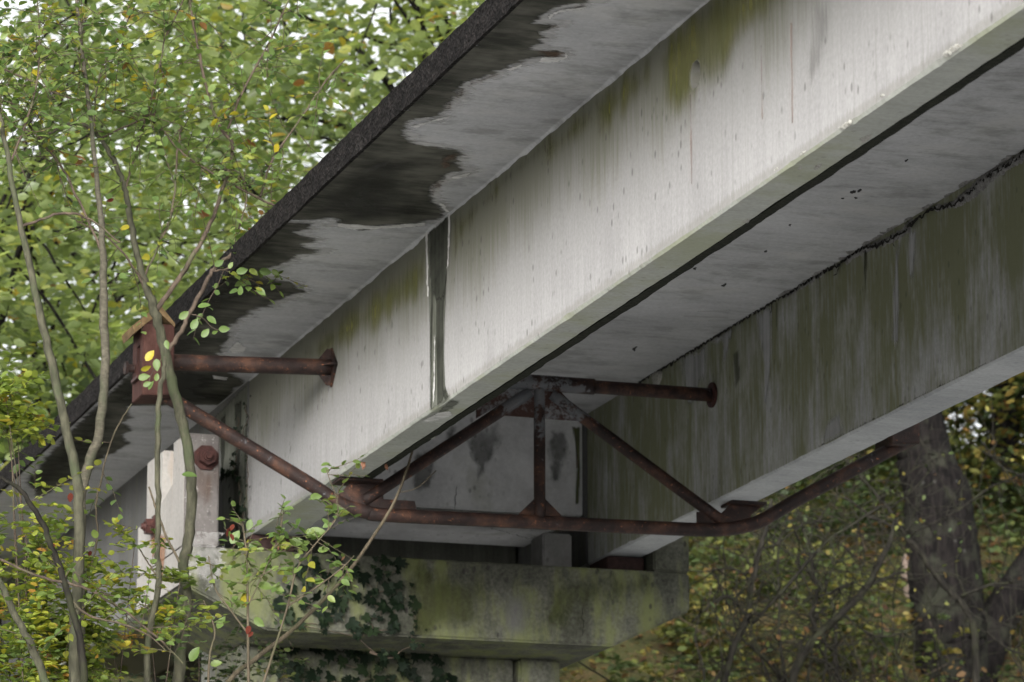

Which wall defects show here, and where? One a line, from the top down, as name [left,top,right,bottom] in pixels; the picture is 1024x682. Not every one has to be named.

leakage [174,0,606,438]
spalling [778,217,913,298]
leakage [893,232,915,343]
spalling [922,153,1024,212]
leakage [757,309,772,399]
leakage [29,373,166,496]
leakage [219,438,246,548]
leakage [471,434,497,474]
leakage [551,434,565,480]